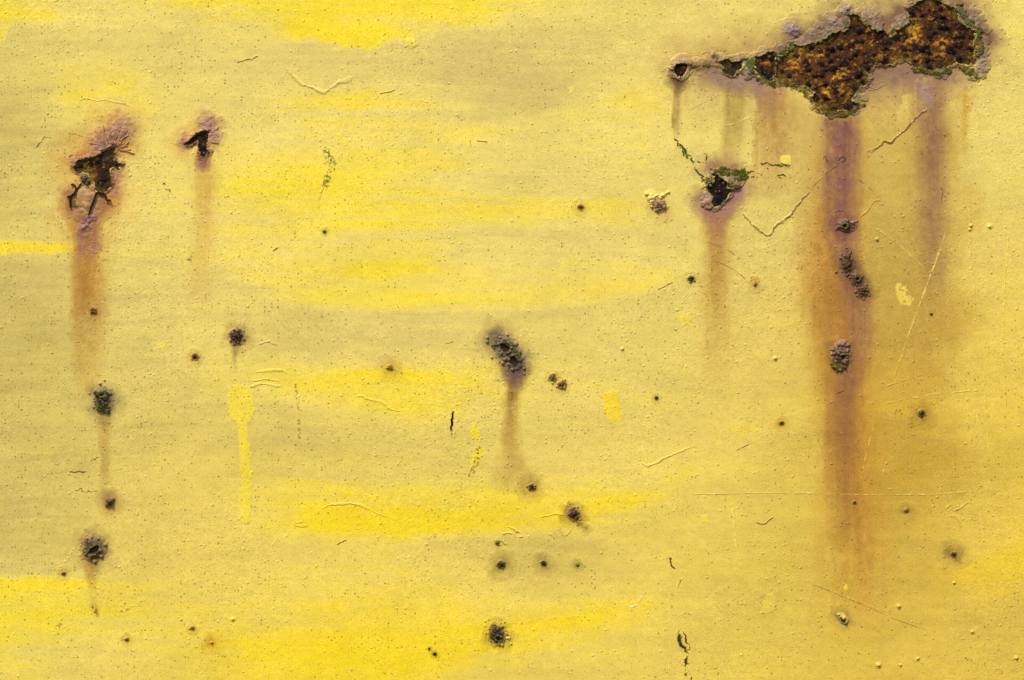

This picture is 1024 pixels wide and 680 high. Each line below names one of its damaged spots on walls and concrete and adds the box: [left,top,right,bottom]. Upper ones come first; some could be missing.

peeling [643,0,1024,139]
rust [180,146,224,318]
crack [742,109,927,236]
rust [54,205,132,619]
rust [469,312,594,536]
rust [681,77,975,649]
rust [477,611,520,655]